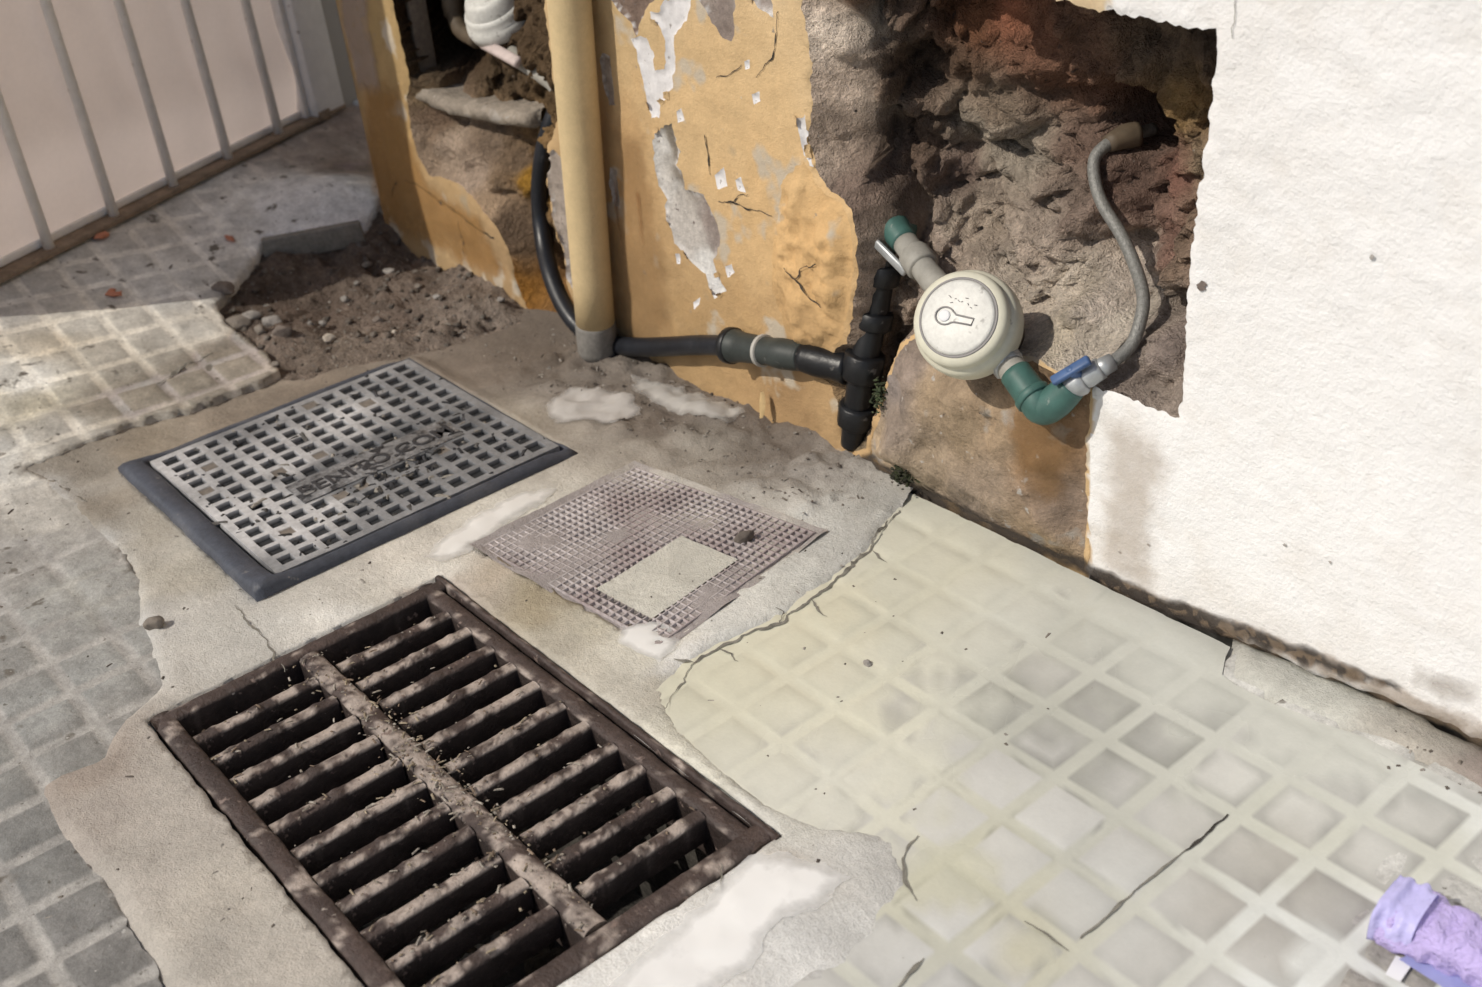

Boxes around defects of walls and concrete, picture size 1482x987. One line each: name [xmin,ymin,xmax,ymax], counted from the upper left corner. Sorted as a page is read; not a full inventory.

spalling [393,0,574,312]
peeling [612,0,773,309]
spalling [794,0,1218,560]
crack [665,510,900,709]
spalling [514,777,612,835]
spalling [385,859,475,915]
spalling [384,886,502,962]
spalling [571,823,670,891]
spalling [598,847,708,923]
crack [1025,814,1229,951]
spalling [411,955,460,987]
spalling [492,941,560,987]